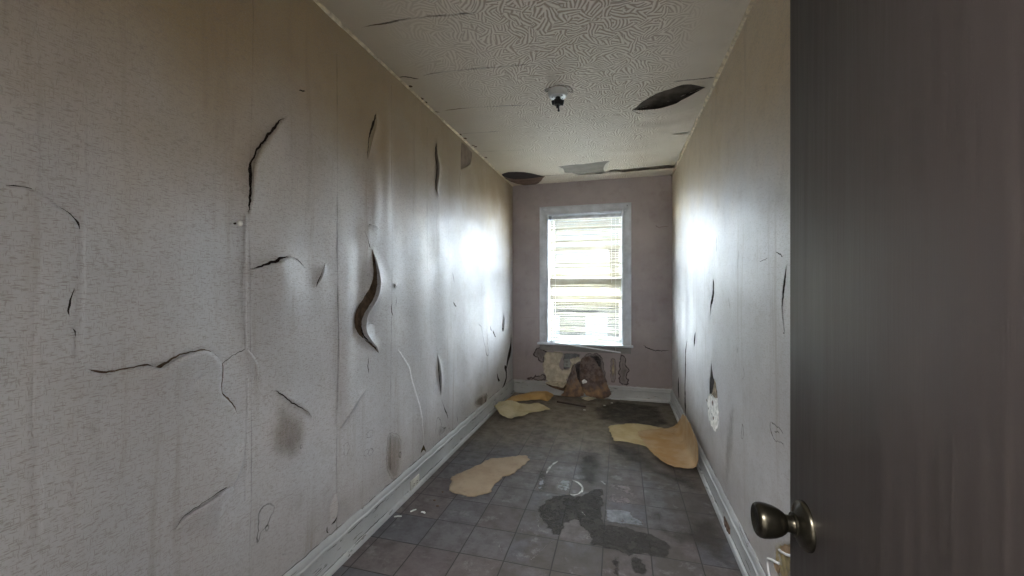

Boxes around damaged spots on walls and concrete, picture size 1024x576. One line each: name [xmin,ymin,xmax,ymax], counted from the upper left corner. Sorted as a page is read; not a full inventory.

flaking render [543,351,581,382]